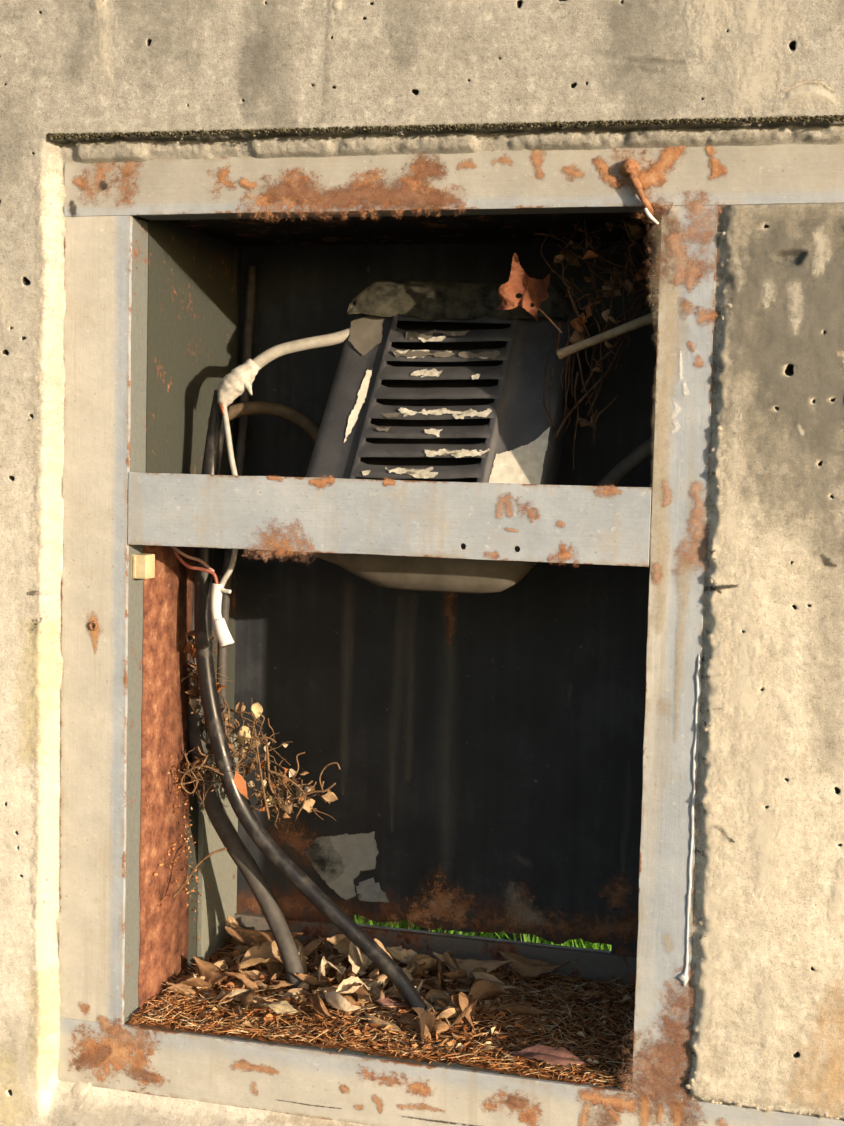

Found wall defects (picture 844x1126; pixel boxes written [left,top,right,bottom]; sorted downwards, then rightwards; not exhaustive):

rust [208,154,477,220]
rust [706,145,727,180]
rust [561,146,724,324]
rust [251,524,314,559]
rust [496,493,539,532]
rust [651,481,710,583]
rust [339,868,638,943]
rust [68,1004,165,1090]
rust [231,1059,279,1094]
rust [354,1064,443,1113]
rust [483,1092,543,1126]
rust [579,969,701,1126]